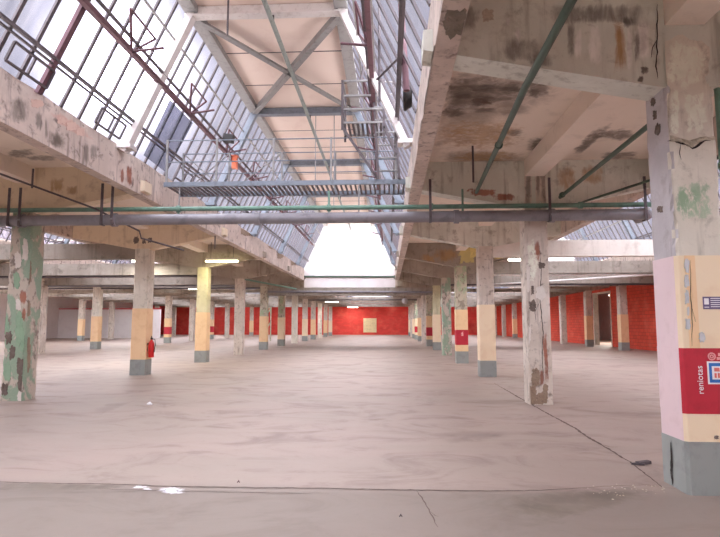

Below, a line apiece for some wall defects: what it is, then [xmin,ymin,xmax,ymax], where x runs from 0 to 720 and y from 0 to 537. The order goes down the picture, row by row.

water stain [492,0,669,78]
crack [650,11,658,77]
water stain [1,90,70,162]
water stain [430,71,578,162]
water stain [524,118,647,210]
peeling [13,238,32,289]
peeling [526,233,546,312]
peeling [1,299,31,401]
spalling [530,368,548,405]
crack [499,386,673,487]